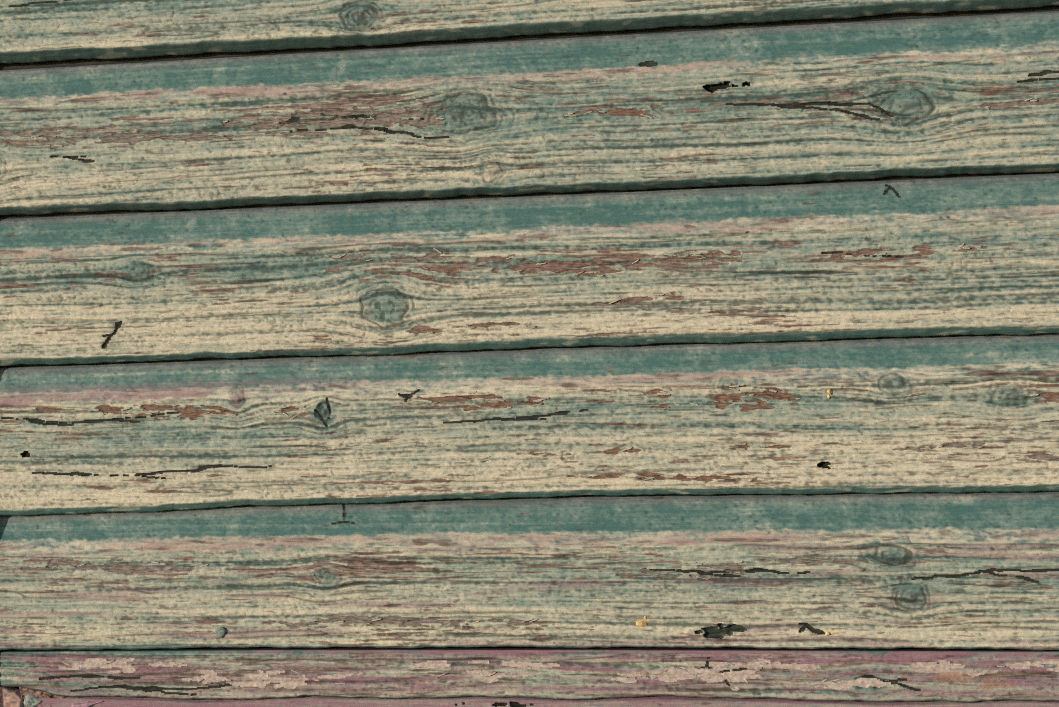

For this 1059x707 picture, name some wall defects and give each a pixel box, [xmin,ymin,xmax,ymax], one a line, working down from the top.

crack [8,0,69,8]
crack [726,101,894,121]
crack [102,321,122,349]
peeling [419,391,550,411]
peeling [643,384,801,412]
crack [32,464,272,479]
crack [642,568,810,577]
spalling [695,623,747,639]
peeling [58,658,136,674]
peeling [149,661,363,689]
peeling [590,658,894,691]
peeling [909,659,1059,677]